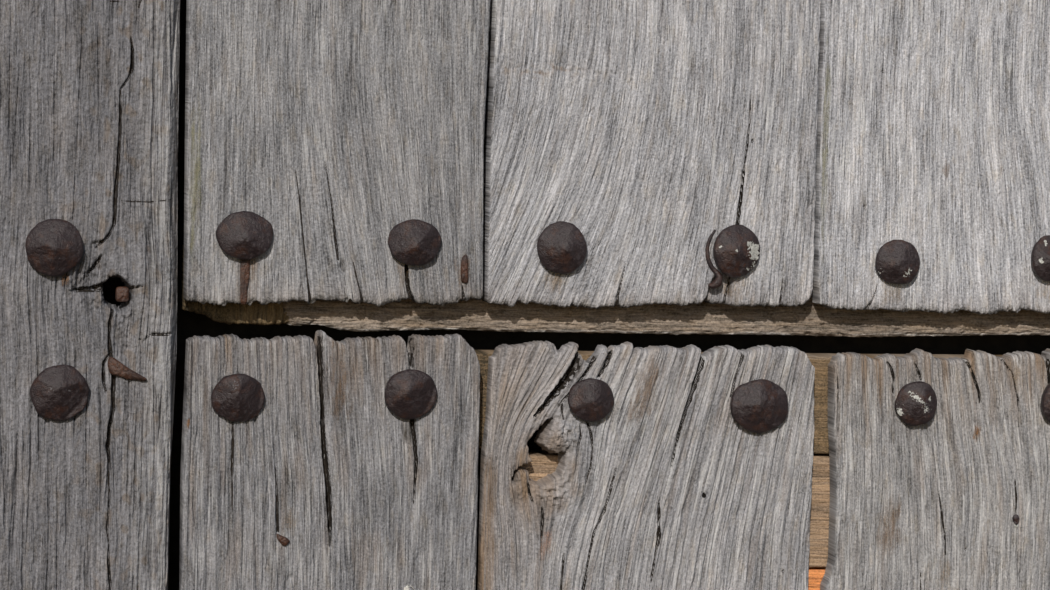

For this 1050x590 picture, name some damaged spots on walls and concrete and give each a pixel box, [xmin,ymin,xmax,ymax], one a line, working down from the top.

crack [736,98,751,224]
crack [74,38,171,590]
crack [316,335,332,545]
crack [527,352,617,590]